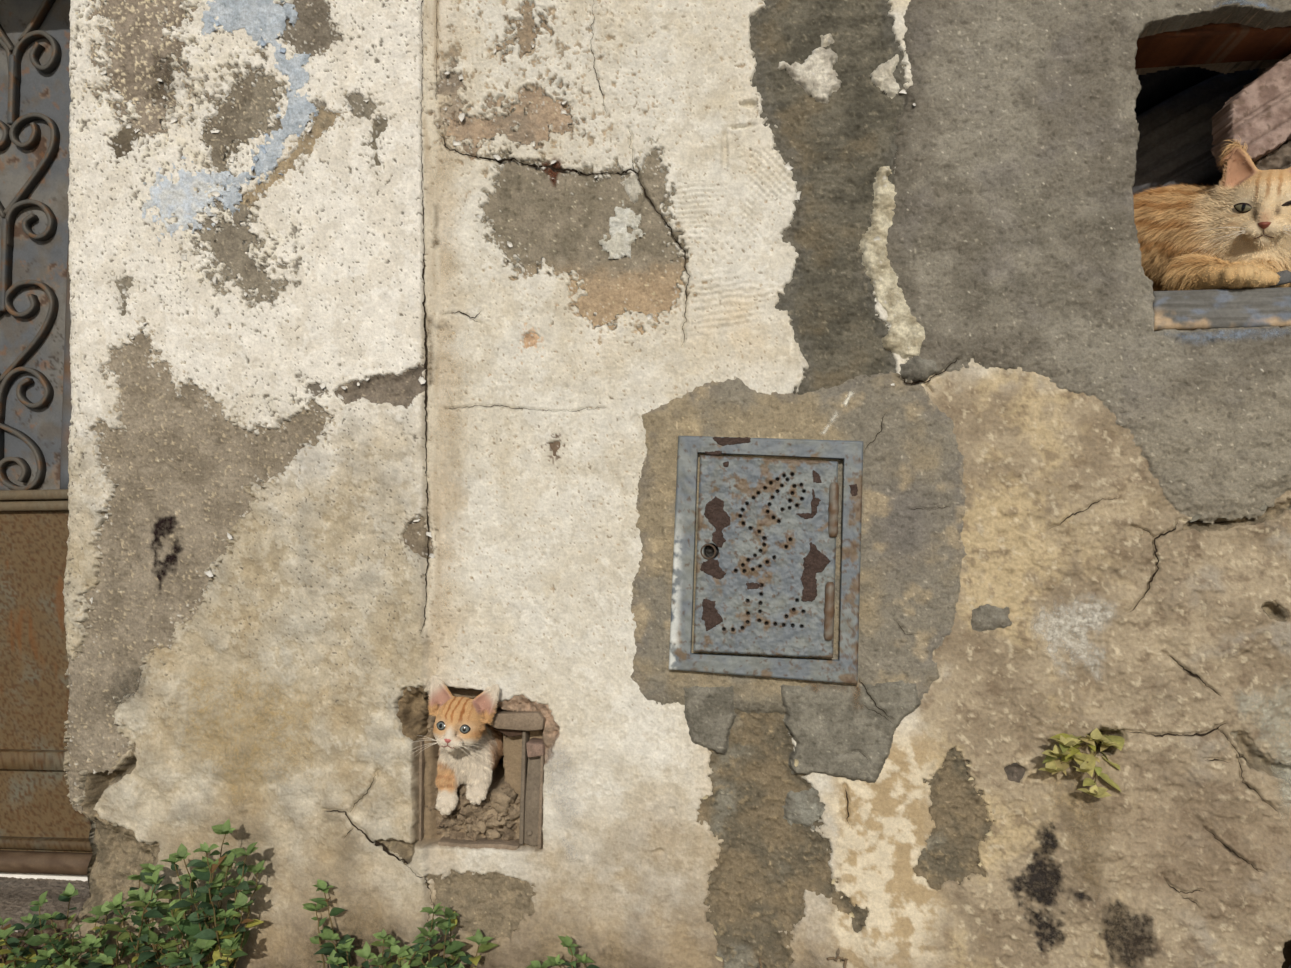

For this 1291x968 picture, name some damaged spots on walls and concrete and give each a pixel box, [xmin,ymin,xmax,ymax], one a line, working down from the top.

crack [591,4,604,103]
peeling [115,277,133,316]
peeling [82,0,388,309]
peeling [431,59,697,335]
crack [441,131,690,343]
peeling [66,319,430,924]
peeling [403,515,435,559]
crack [1051,498,1118,528]
crack [1130,519,1242,612]
crack [327,771,434,921]
damp [1010,804,1101,952]
damp [1104,901,1155,968]